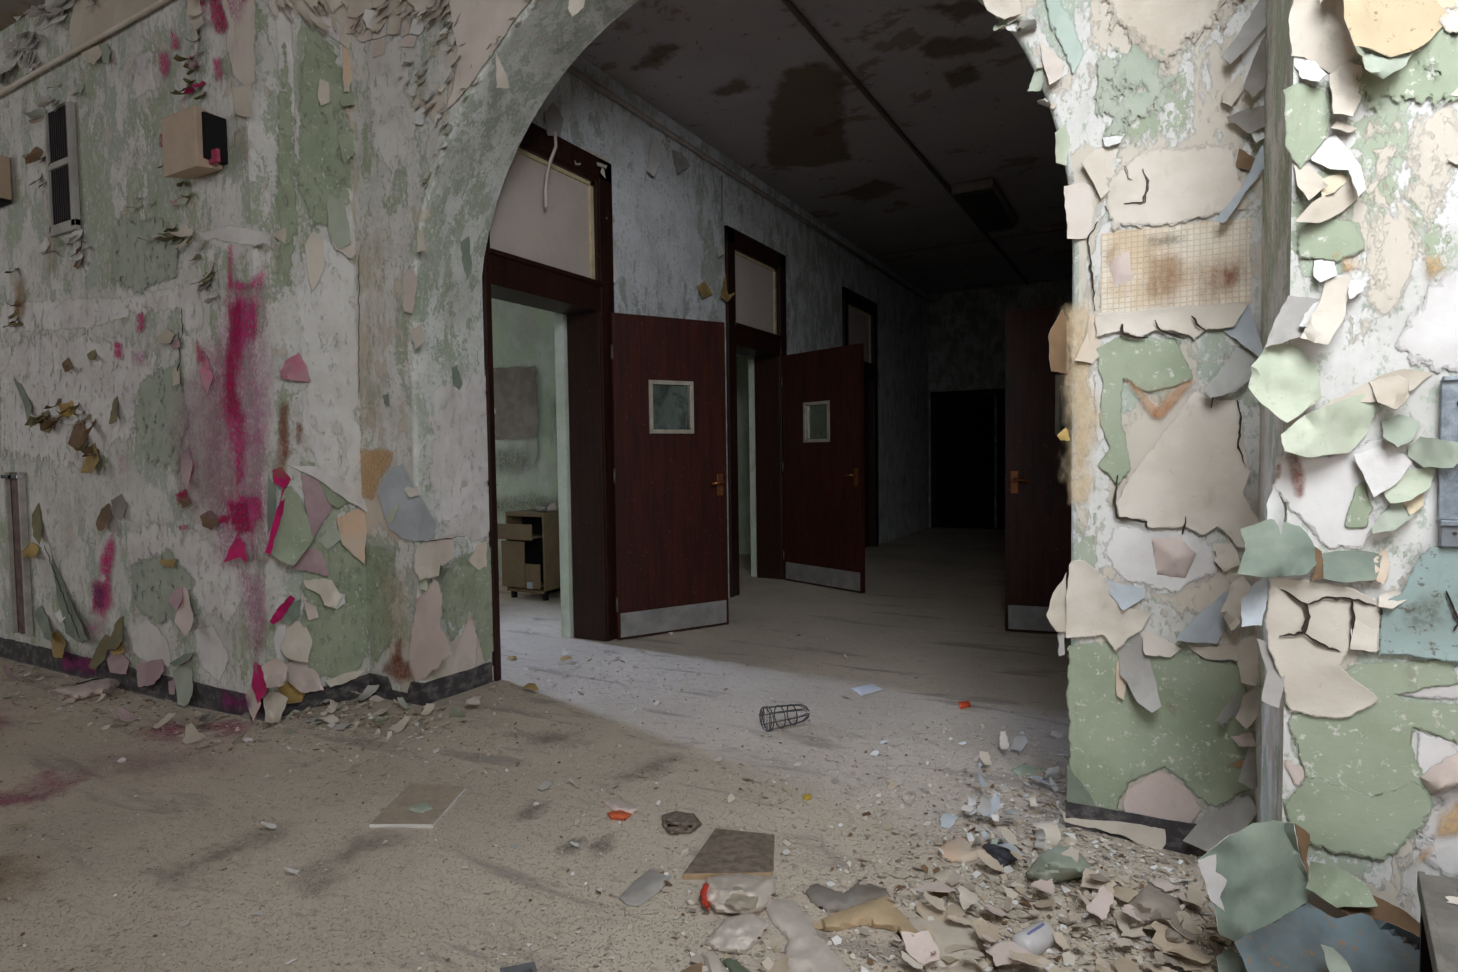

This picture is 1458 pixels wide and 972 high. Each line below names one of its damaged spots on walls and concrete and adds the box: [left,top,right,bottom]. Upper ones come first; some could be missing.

peeling [568,0,585,18]
peeling [921,0,1267,239]
peeling [574,149,608,178]
peeling [697,241,735,302]
peeling [0,0,538,744]
crack [1279,589,1376,652]